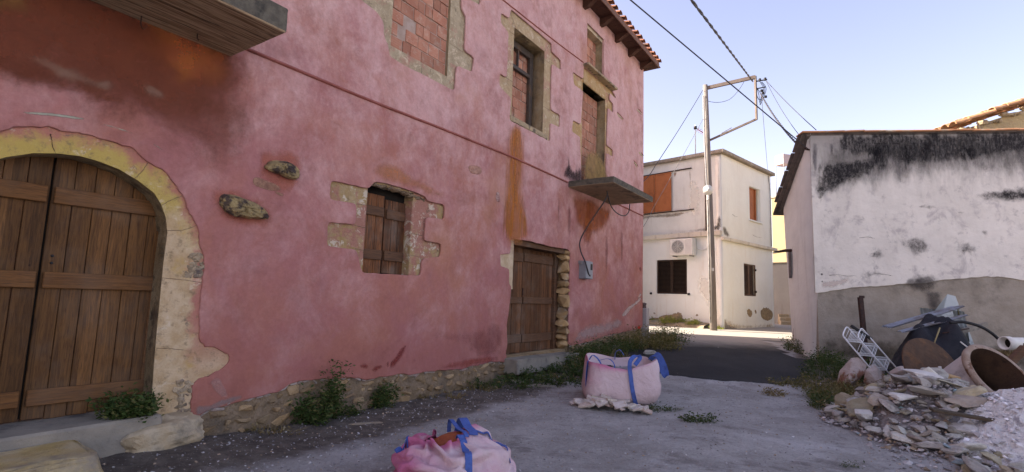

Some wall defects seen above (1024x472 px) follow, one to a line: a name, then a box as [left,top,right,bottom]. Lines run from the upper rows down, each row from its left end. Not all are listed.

damp [813,132,1024,194]
corrosion [506,130,526,240]
damp [984,190,1024,200]
corrosion [574,200,609,241]
spalling [185,252,205,278]